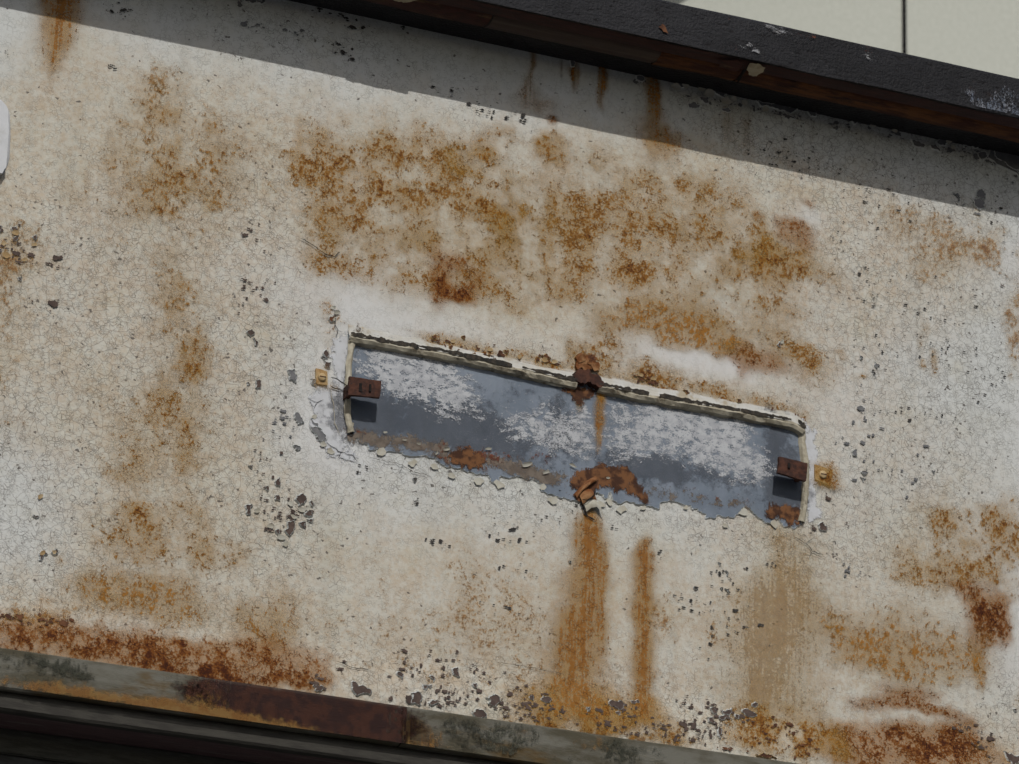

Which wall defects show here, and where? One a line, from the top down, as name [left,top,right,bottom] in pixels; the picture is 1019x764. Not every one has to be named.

rust [41,0,81,70]
rust [0,219,47,342]
rust [0,261,441,747]
peeling [287,369,297,391]
peeling [320,349,331,369]
rust [268,77,847,444]
peeling [344,325,828,532]
rust [570,462,649,504]
rust [422,509,696,749]
rust [721,498,1019,764]